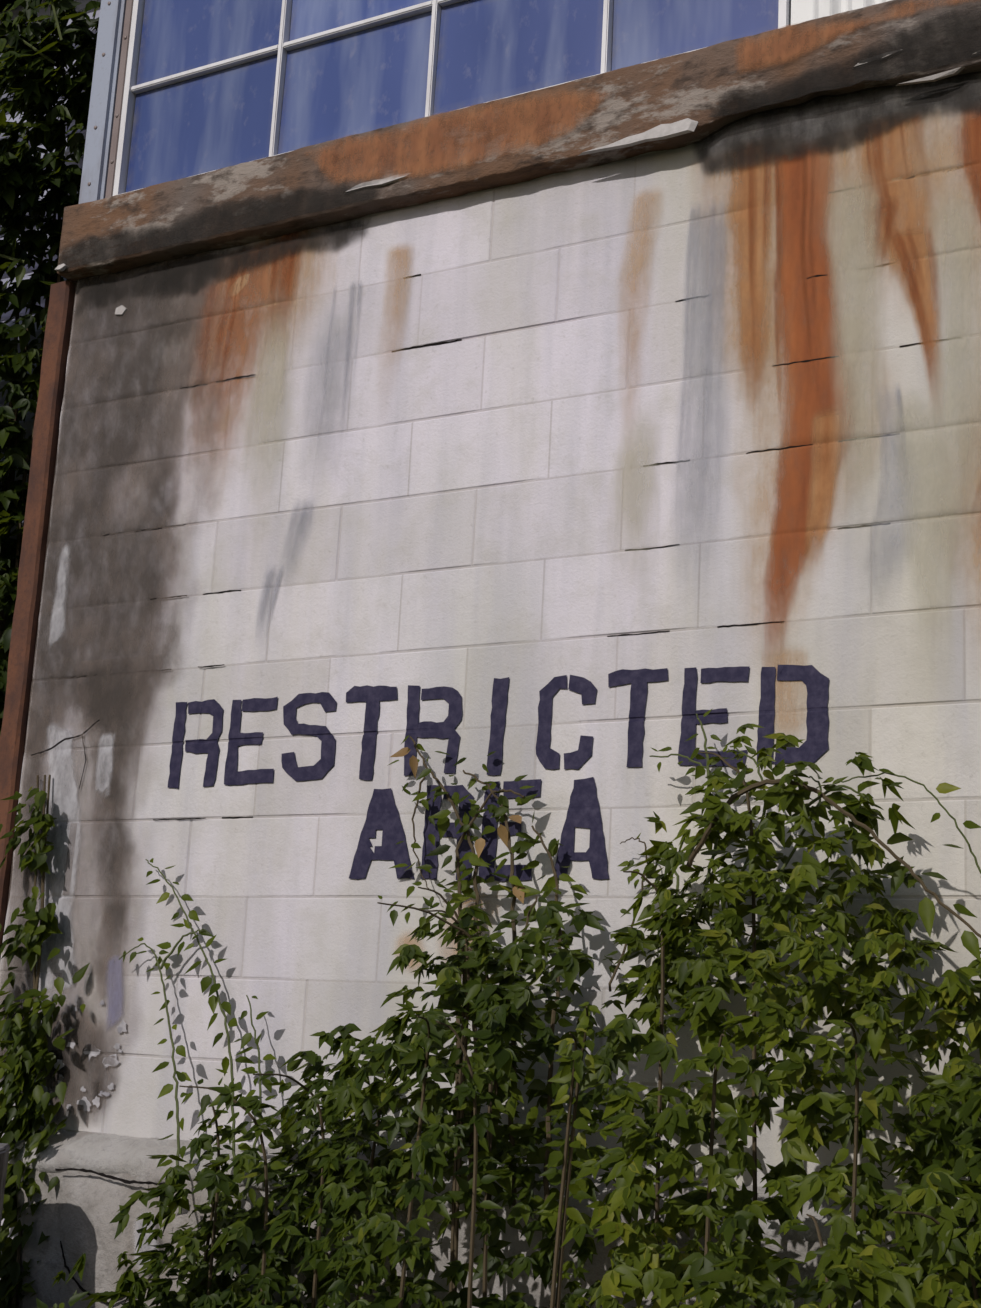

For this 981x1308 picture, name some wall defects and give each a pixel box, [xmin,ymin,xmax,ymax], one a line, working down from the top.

rust [739,22,858,68]
rust [319,93,599,180]
damp [58,185,375,306]
rust [855,112,981,365]
rust [194,232,301,395]
rust [720,149,853,615]
peeling [34,1007,127,1121]